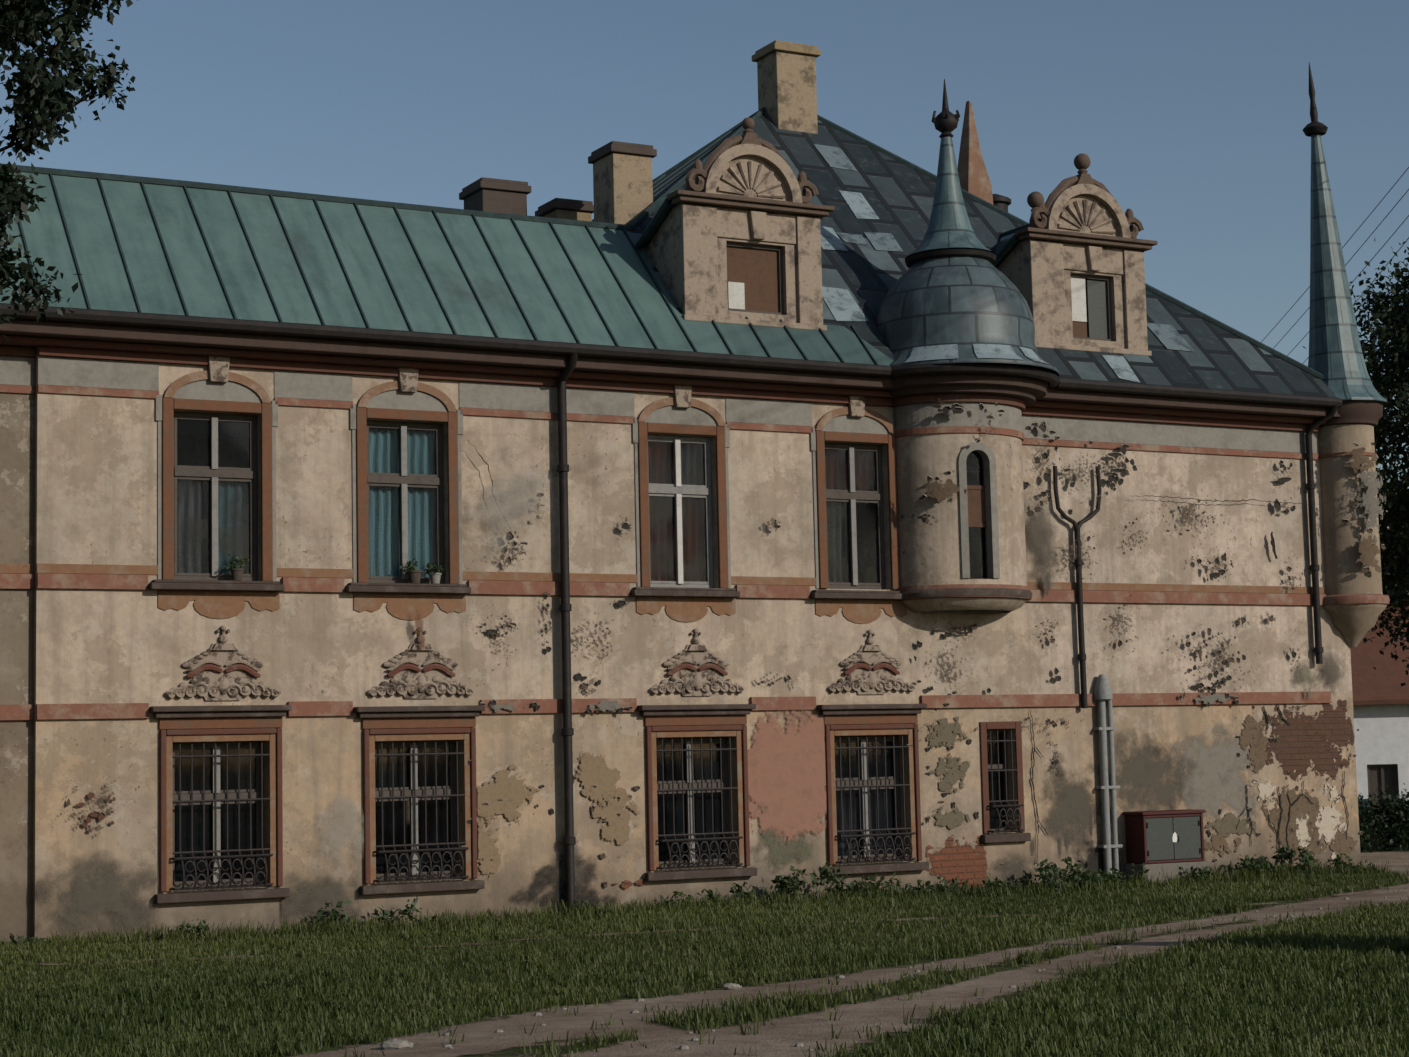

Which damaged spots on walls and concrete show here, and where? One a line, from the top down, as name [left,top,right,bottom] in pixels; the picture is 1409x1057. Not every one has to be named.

peeling [907,470,967,526]
peeling [1023,421,1144,512]
spalling [52,776,140,836]
peeling [461,764,554,879]
peeling [573,751,641,859]
flaking render [907,622,1004,889]
flaking render [1166,615,1364,866]
damp [514,845,617,913]